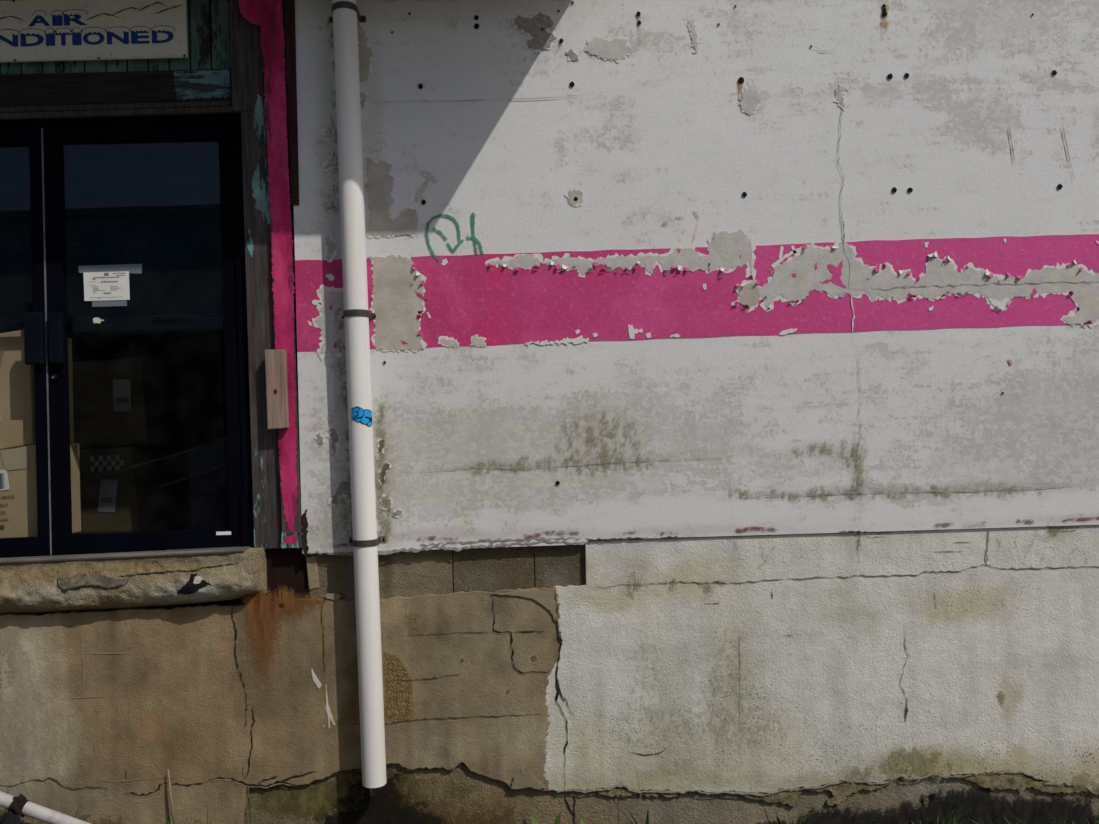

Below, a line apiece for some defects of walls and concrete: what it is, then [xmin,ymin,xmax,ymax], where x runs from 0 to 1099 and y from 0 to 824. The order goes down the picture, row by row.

peeling [512,11,559,53]
peeling [363,156,438,238]
peeling [308,233,346,361]
peeling [369,253,486,353]
peeling [485,229,1099,329]
crack [587,532,1099,588]
crack [2,559,317,824]
corrosion [242,587,325,682]
crack [319,605,327,673]
crack [346,591,576,824]
crack [900,631,909,722]
water stain [317,764,515,824]